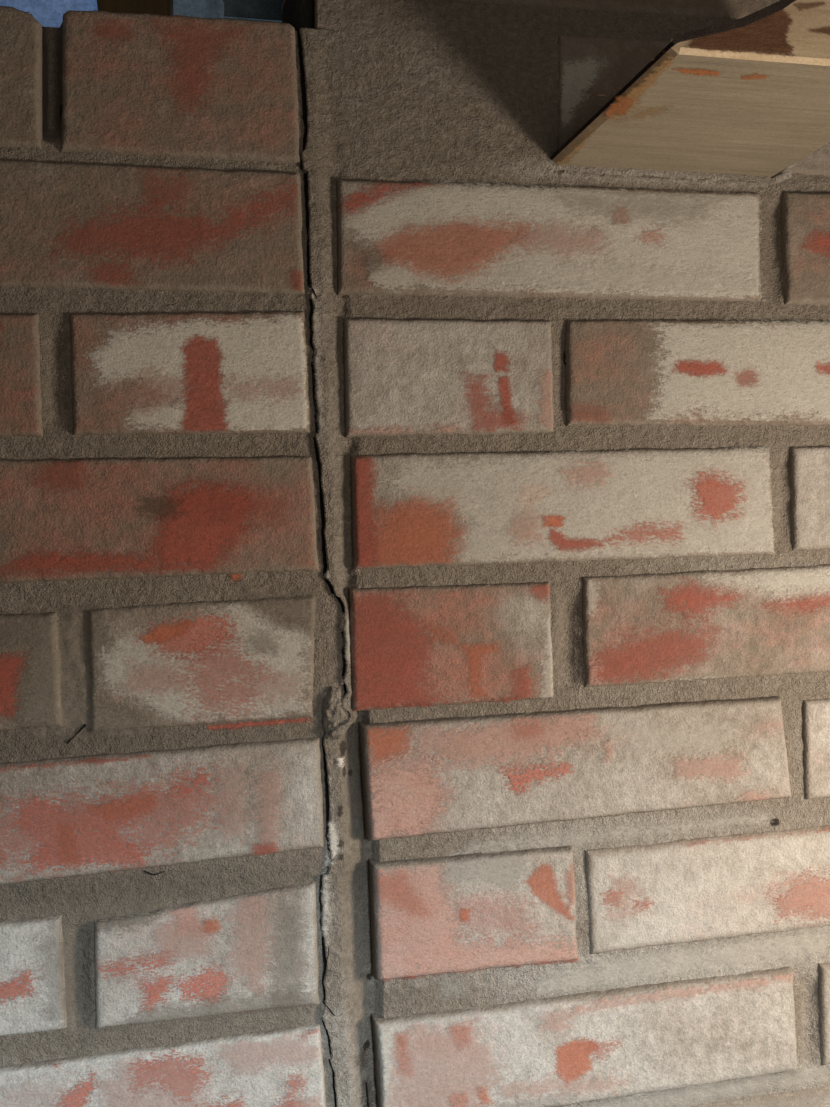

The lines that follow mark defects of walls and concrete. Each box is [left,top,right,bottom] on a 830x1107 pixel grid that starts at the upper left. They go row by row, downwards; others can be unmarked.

crack [297,30,347,695]
crack [319,736,337,1107]